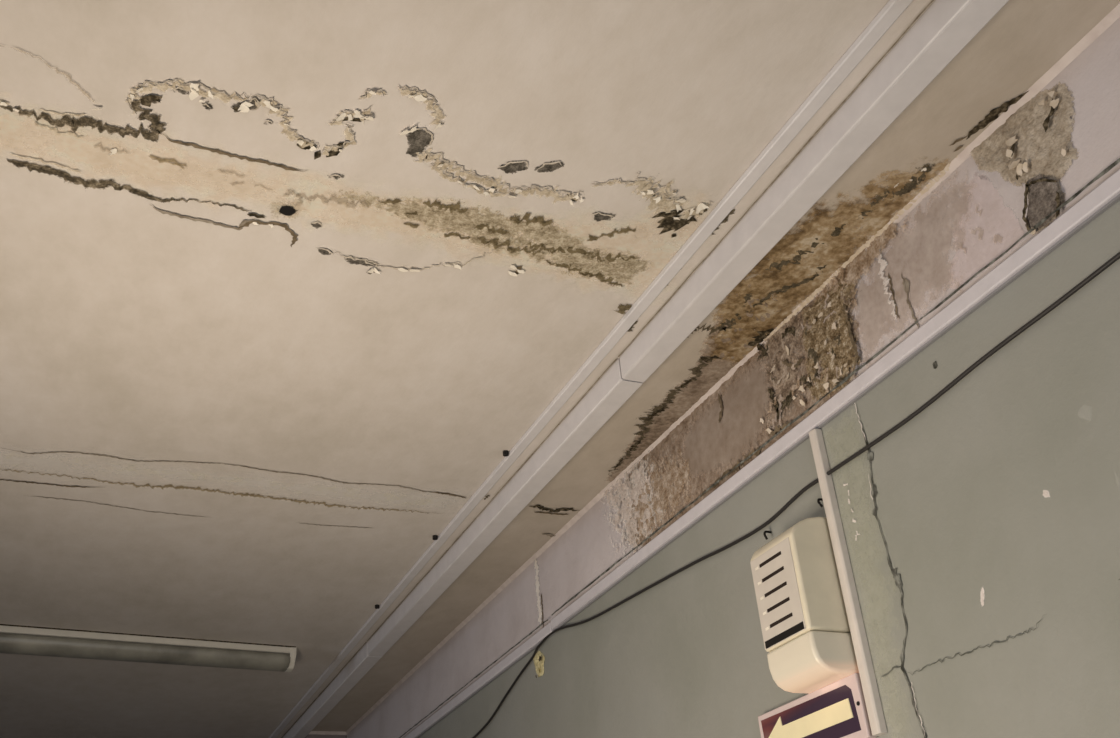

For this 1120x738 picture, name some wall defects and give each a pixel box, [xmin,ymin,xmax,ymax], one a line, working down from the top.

crack [0,96,308,247]
leakage [149,155,187,169]
peeling [318,248,492,274]
peeling [126,79,714,238]
leakage [338,190,654,287]
leakage [877,164,937,199]
leakage [854,183,972,361]
flaking render [948,83,1078,290]
flaking render [603,223,906,559]
crack [0,448,465,528]
crack [855,405,1046,738]